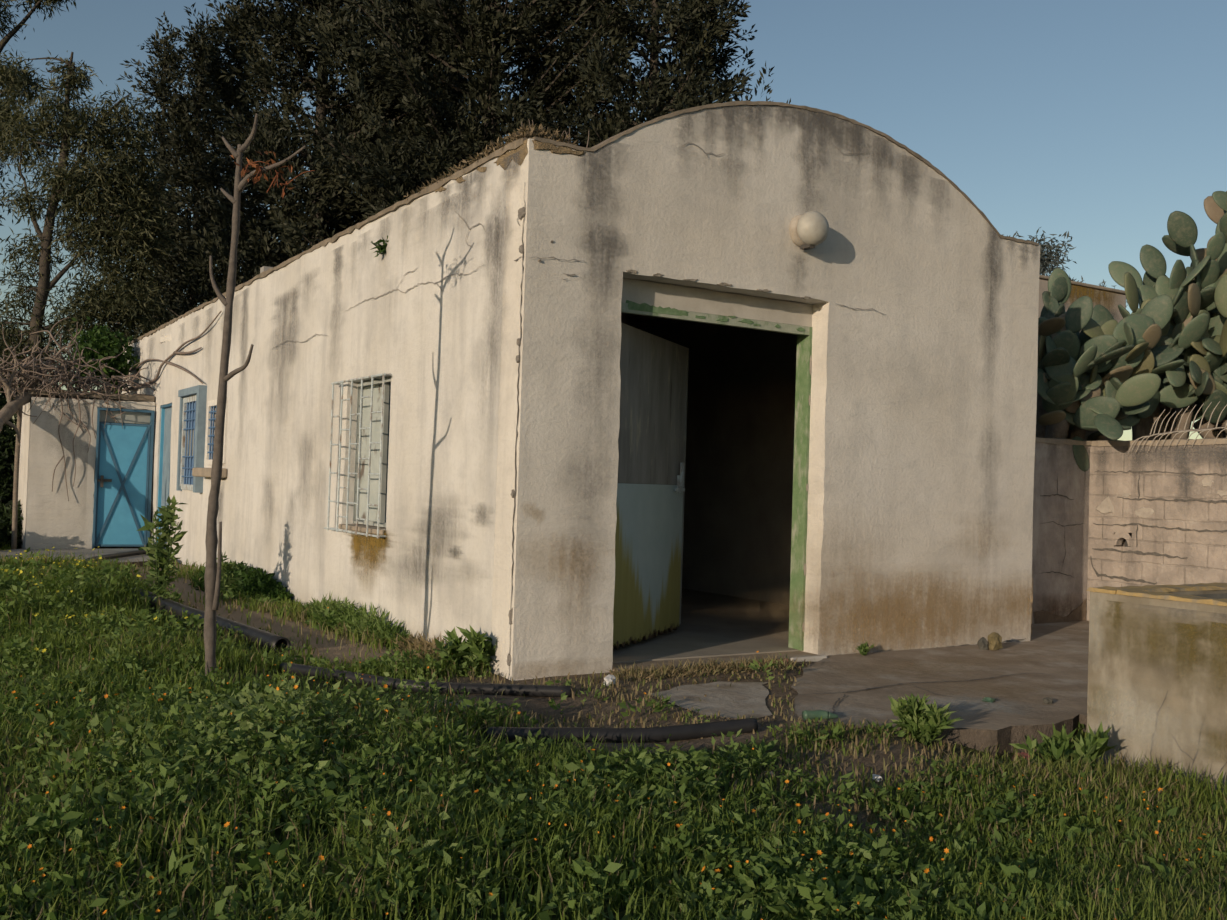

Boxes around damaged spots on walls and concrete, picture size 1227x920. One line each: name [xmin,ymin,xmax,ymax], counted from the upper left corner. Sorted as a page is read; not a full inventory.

spalling [476,139,586,172]
crack [347,213,488,311]
leakage [988,228,998,317]
crack [510,186,582,617]
rust [351,531,386,568]
crack [802,673,1043,720]